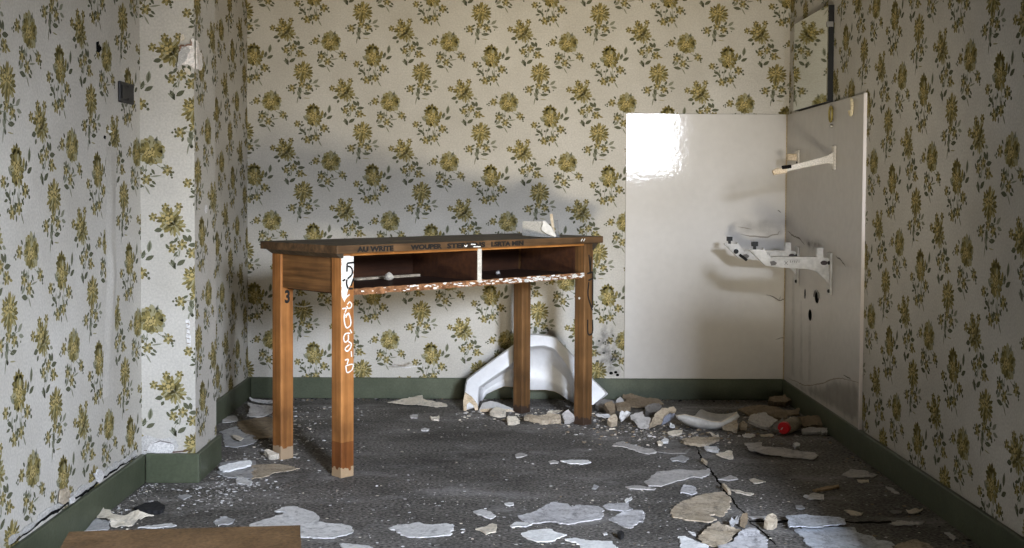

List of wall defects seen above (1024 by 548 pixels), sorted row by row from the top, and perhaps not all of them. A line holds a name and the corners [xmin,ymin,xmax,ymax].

peeling [177,34,203,76]
crack [696,446,788,545]
crack [845,518,892,526]